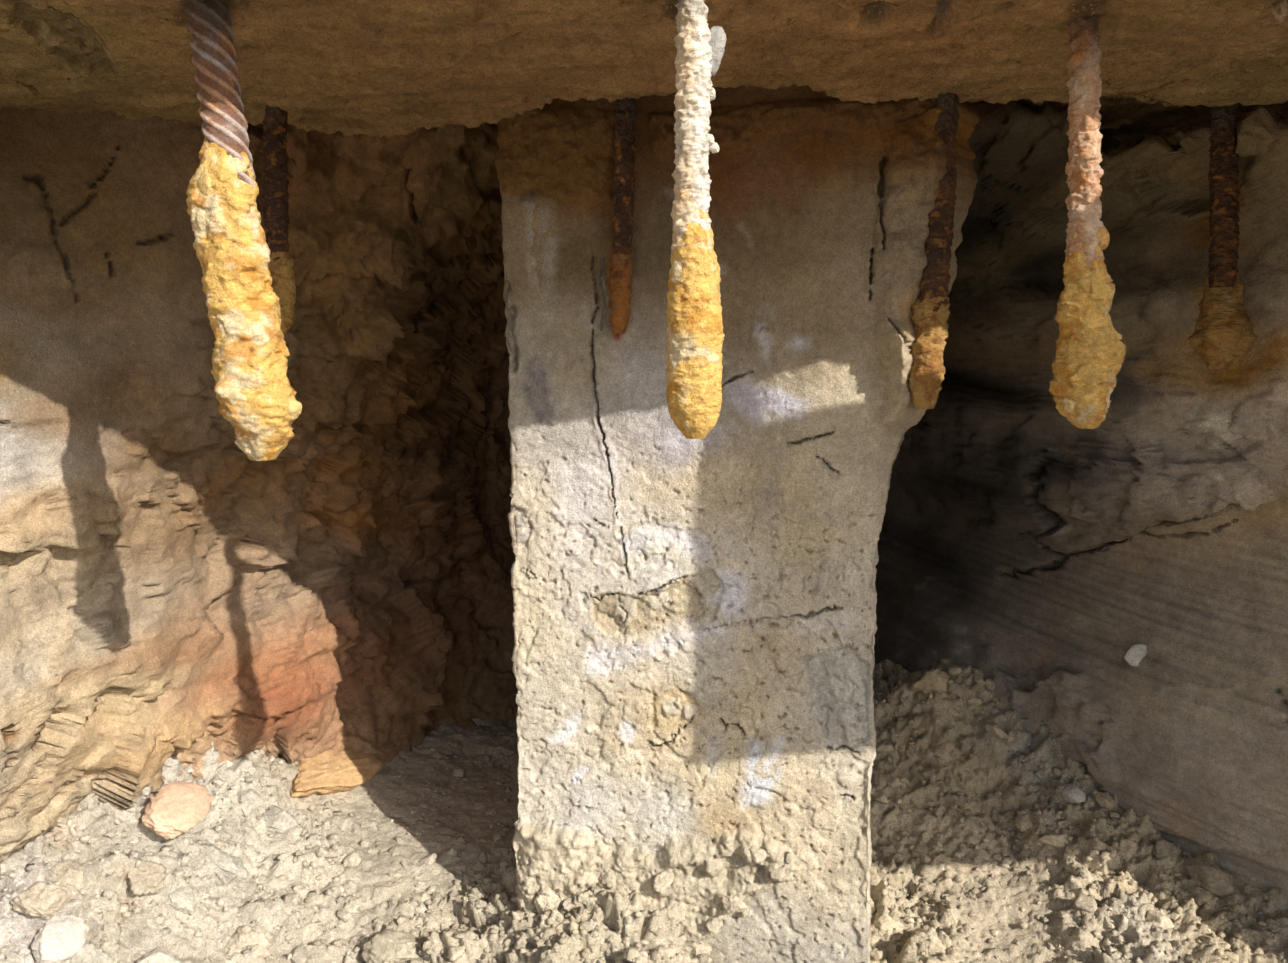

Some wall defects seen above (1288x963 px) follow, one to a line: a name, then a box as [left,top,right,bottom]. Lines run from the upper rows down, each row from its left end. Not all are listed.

corrosion [656,0,679,21]
corrosion [919,104,980,160]
spalling [185,0,302,461]
spalling [505,278,521,373]
corrosion [891,281,921,344]
spalling [908,92,960,409]
spalling [1049,14,1169,527]
spalling [1188,103,1258,370]
crack [589,255,622,529]
spalling [511,504,534,549]
crack [589,561,629,602]
spalling [1124,644,1147,667]